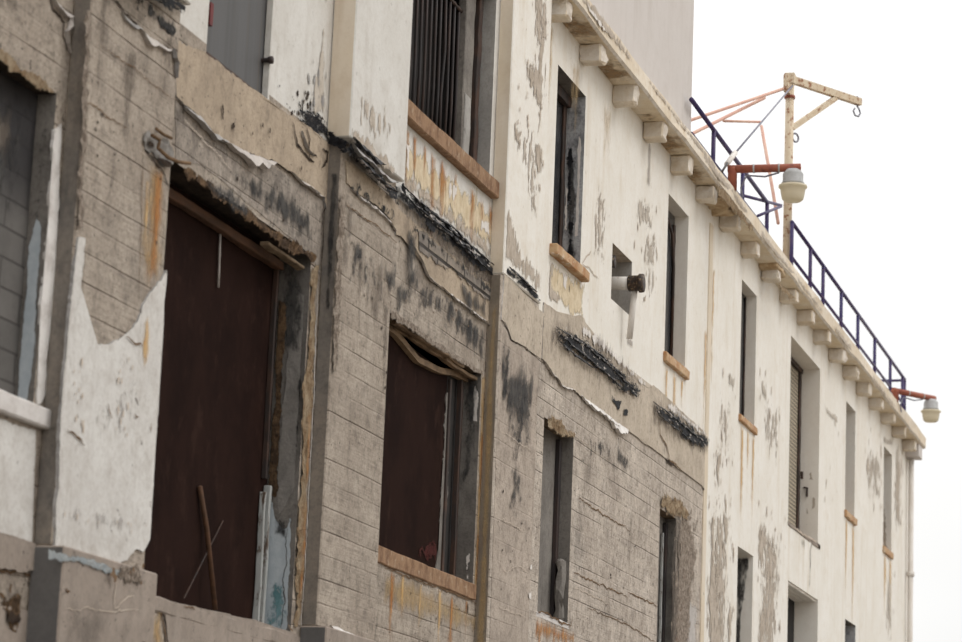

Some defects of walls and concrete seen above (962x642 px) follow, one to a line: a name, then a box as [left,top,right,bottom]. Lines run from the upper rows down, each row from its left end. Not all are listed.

peeling [515,0,549,216]
peeling [48,10,167,613]
corrosion [139,150,169,287]
peeling [143,29,330,630]
leakage [326,174,337,308]
leakage [399,209,492,357]
corrosion [405,133,492,244]
leakage [505,366,533,515]
spalling [333,98,735,642]
crack [658,417,681,469]
crack [154,606,195,642]
crack [575,498,658,642]